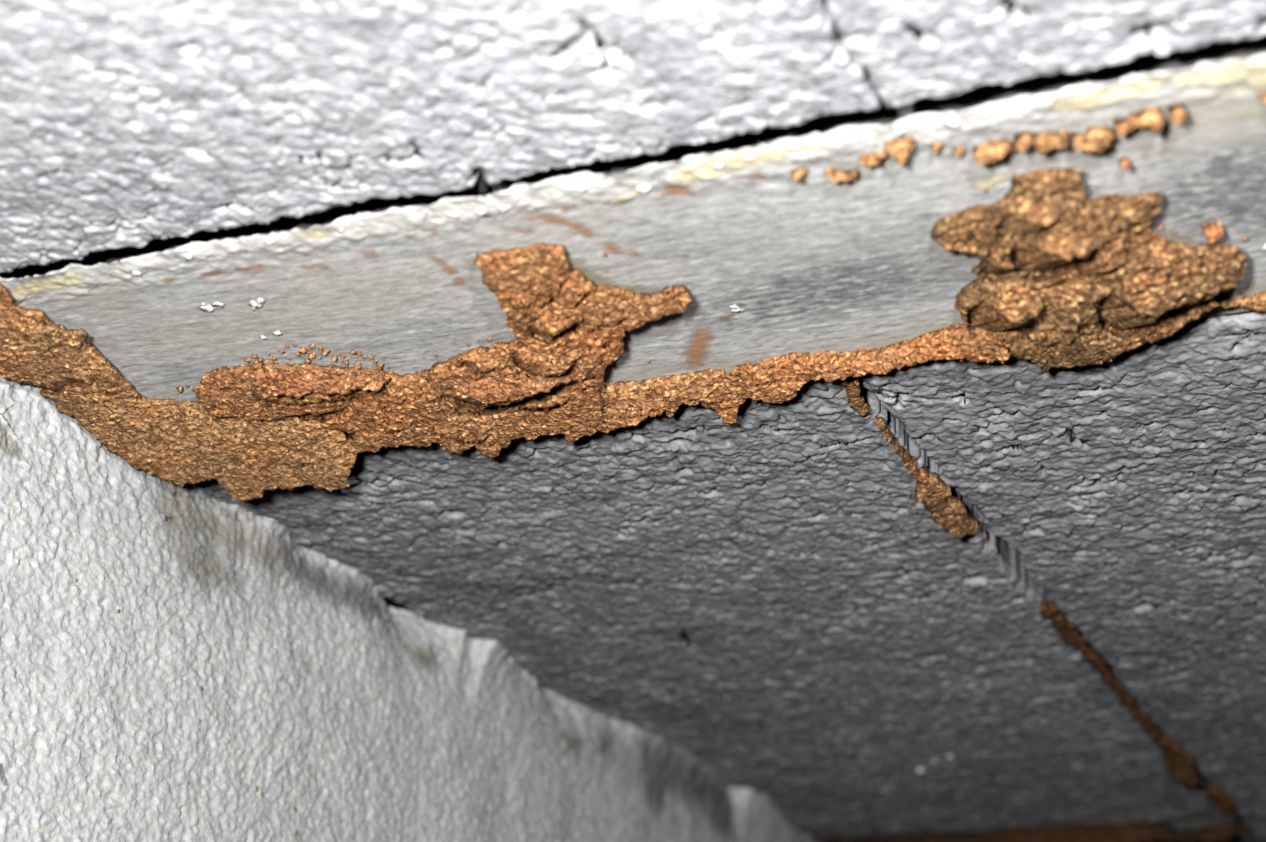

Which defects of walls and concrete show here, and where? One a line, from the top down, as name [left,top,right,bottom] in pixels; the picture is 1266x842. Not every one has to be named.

crack [997,0,1029,19]
crack [535,19,625,71]
crack [826,29,850,43]
crack [905,25,934,39]
crack [1134,22,1161,44]
crack [296,152,325,162]
crack [383,142,424,162]
crack [472,168,488,196]
crack [1066,428,1086,444]